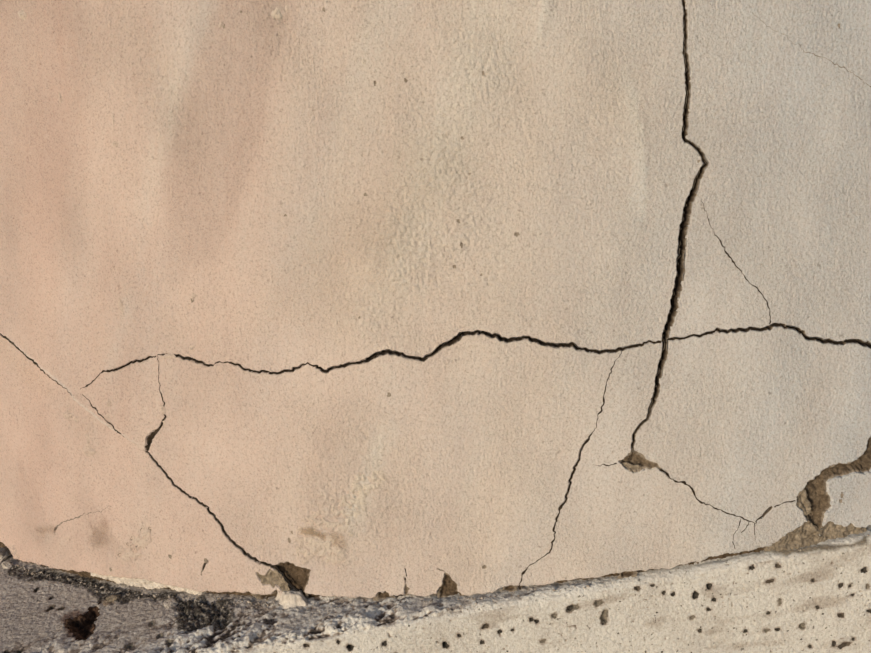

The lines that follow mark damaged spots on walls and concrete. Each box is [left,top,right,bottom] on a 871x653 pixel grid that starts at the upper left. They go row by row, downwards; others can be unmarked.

crack [174,0,871,590]
crack [0,333,72,396]
crack [82,354,166,437]
crack [54,507,108,531]
peeling [0,470,387,632]
crack [145,451,299,592]
spalling [554,569,675,596]
spalling [678,437,871,566]